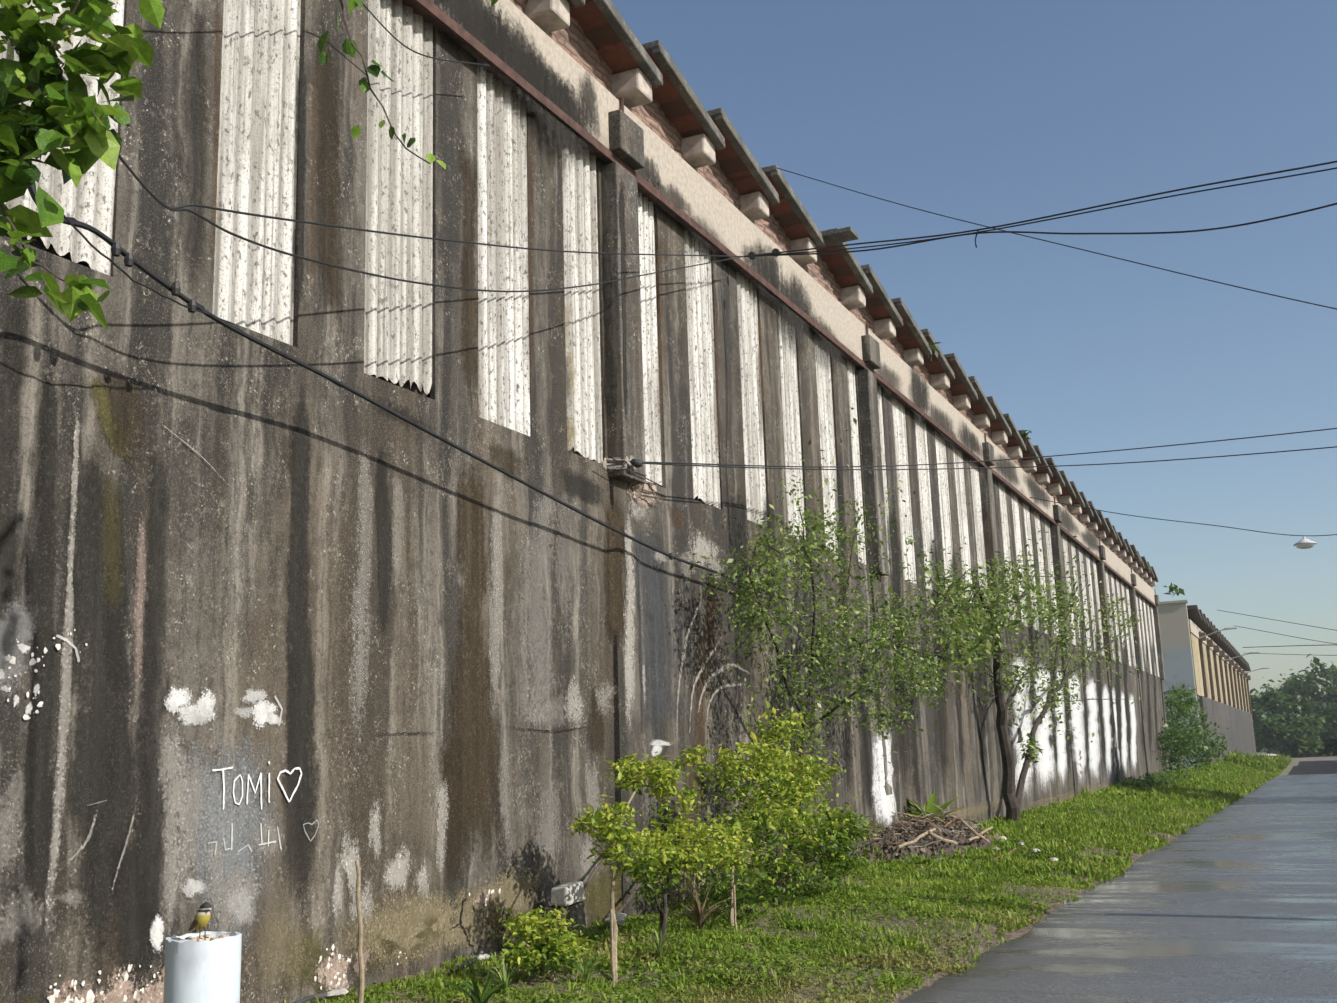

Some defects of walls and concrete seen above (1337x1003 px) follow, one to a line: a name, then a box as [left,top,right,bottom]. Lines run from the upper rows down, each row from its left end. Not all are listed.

leakage [295,43,342,319]
leakage [461,150,478,389]
leakage [744,245,842,365]
leakage [878,366,1099,550]
leakage [0,301,320,981]
leakage [332,450,503,922]
leakage [564,472,754,736]
leakage [836,464,874,807]
leakage [888,511,922,806]
leakage [931,543,987,778]
leakage [1028,619,1158,781]
peeling [47,964,165,1003]